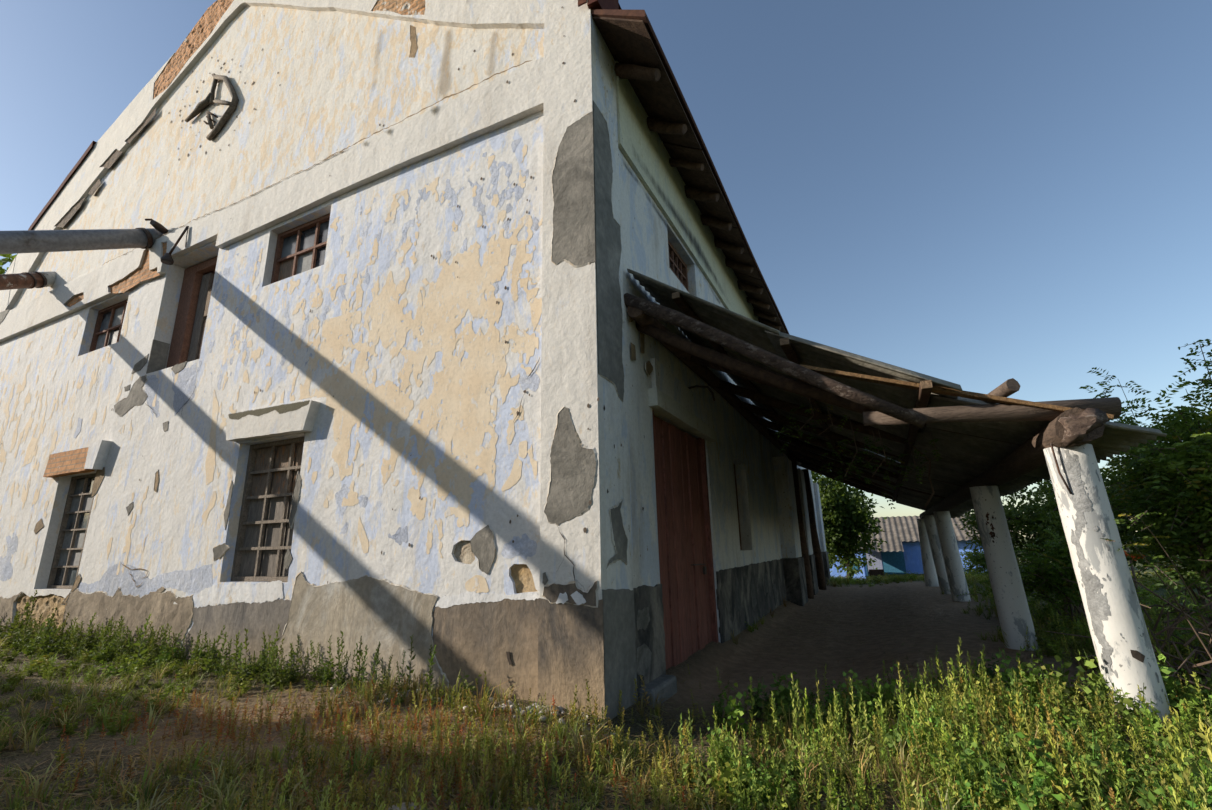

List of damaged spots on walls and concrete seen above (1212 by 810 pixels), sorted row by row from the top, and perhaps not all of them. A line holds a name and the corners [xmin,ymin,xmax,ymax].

flaking render [56,0,256,228]
flaking render [372,0,426,58]
peeling [0,138,599,650]
crack [556,524,575,580]
peeling [1057,450,1126,678]